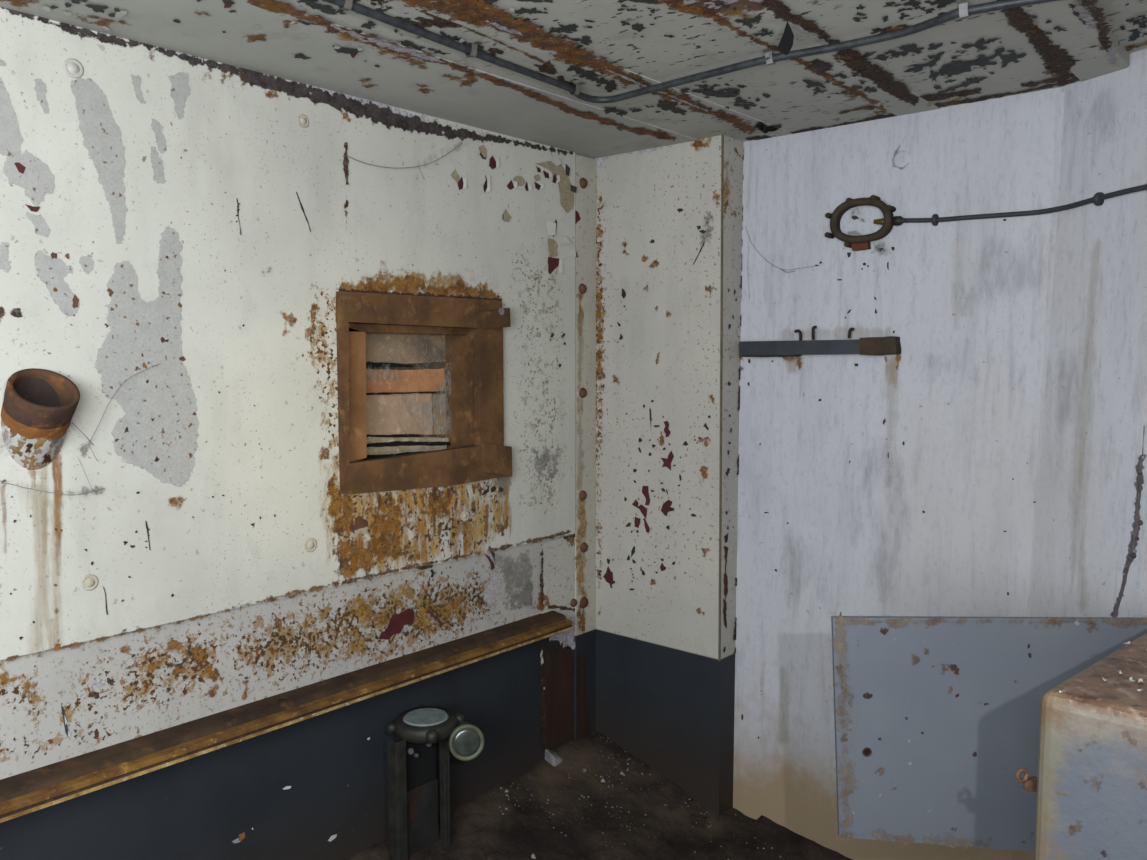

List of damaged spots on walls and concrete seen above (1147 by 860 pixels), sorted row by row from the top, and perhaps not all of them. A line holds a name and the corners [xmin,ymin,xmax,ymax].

peeling [70,77,127,243]
peeling [477,0,601,49]
peeling [617,0,658,37]
peeling [603,81,770,116]
peeling [883,0,955,22]
peeling [862,38,1027,94]
peeling [34,251,94,316]
peeling [95,226,199,487]
peeling [506,158,581,518]
corrosion [0,197,619,763]
peeling [603,400,711,590]
crack [1111,426,1146,617]